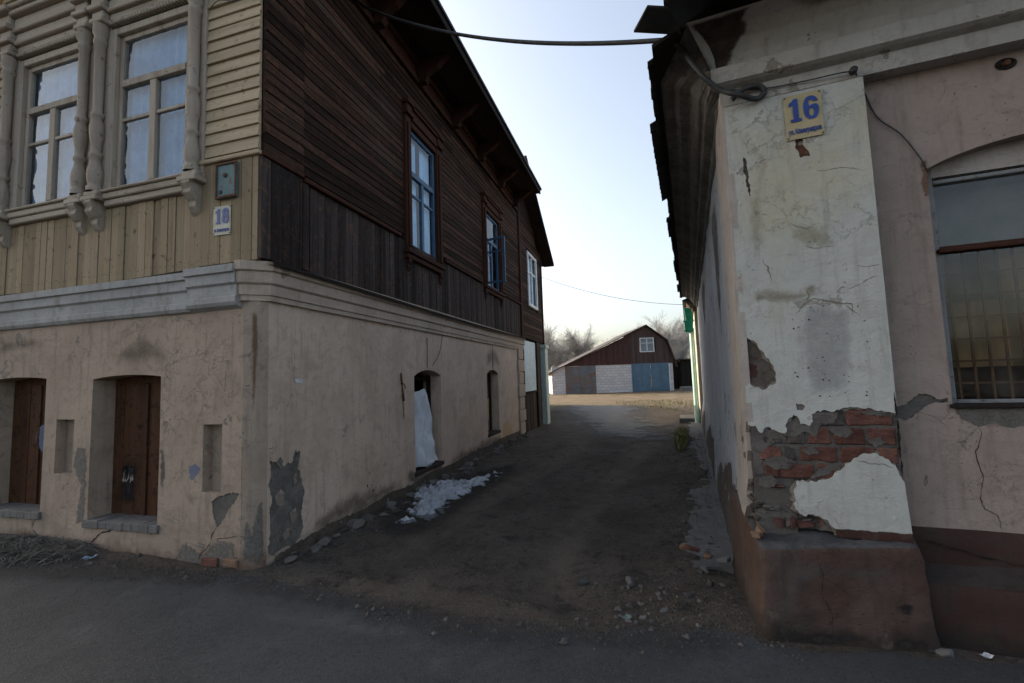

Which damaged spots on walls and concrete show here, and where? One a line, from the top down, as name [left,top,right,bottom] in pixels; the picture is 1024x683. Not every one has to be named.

crack [797,264,879,315]
spalling [741,339,775,387]
spalling [212,493,239,526]
peeling [268,430,524,562]
spalling [702,394,1024,551]
crack [964,425,1003,533]